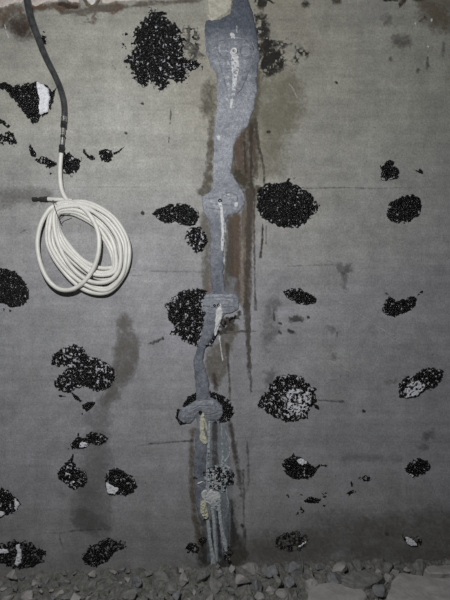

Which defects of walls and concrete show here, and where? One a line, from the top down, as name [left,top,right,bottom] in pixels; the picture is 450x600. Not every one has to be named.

rust [224,117,265,305]